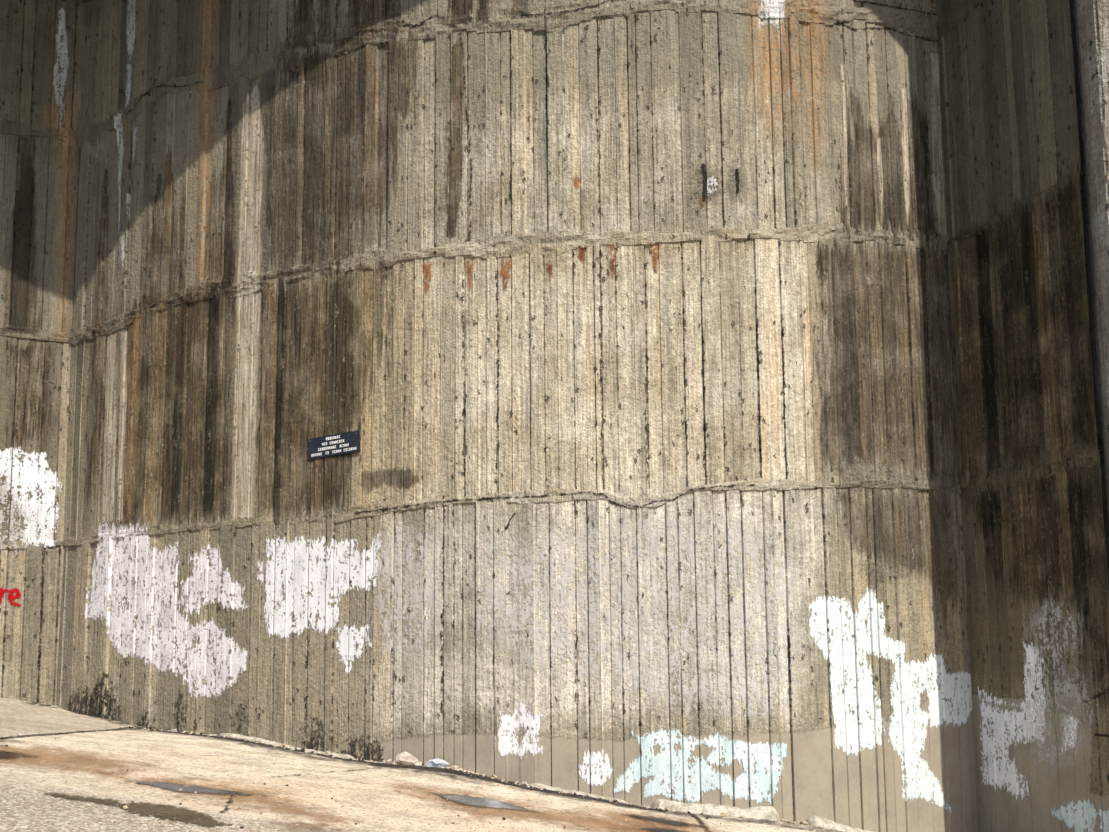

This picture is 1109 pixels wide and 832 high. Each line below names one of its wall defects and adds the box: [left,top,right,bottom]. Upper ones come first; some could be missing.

damp [53,8,69,126]
damp [446,39,466,238]
damp [443,0,489,25]
damp [757,0,785,51]
damp [86,0,419,531]
damp [813,52,1109,707]